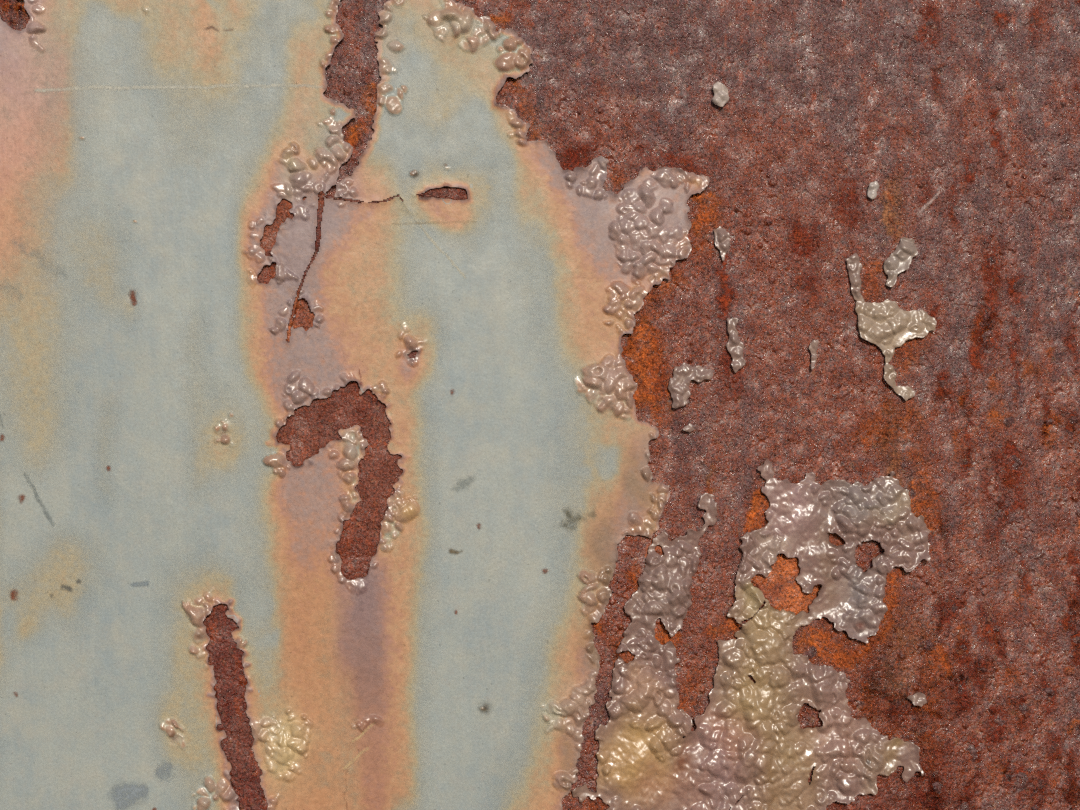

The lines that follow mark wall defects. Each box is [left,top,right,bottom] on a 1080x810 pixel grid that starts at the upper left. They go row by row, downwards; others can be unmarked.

crack [299,194,403,288]
rust [237,0,1080,810]